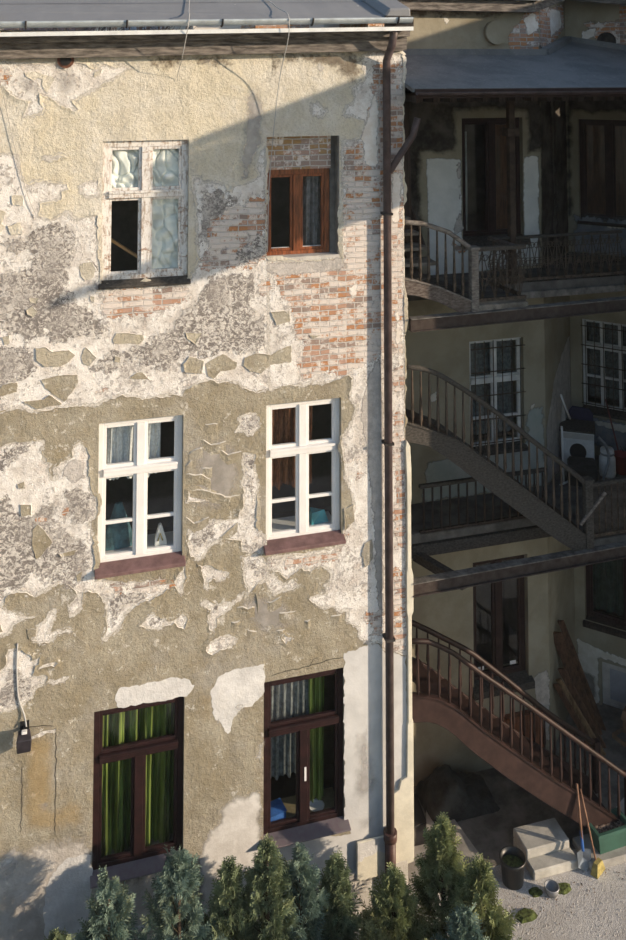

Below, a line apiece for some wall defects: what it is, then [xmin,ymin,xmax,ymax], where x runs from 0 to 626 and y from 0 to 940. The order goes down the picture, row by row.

flaking render [508,4,564,49]
flaking render [582,19,620,44]
spalling [0,51,409,714]